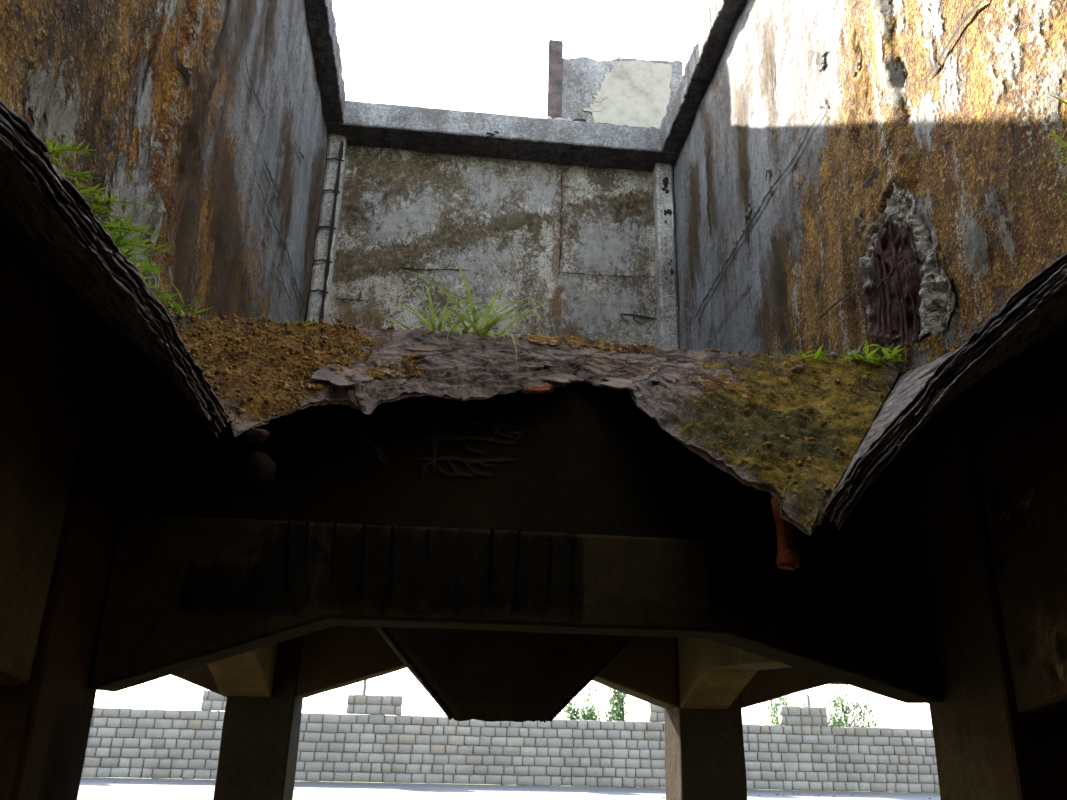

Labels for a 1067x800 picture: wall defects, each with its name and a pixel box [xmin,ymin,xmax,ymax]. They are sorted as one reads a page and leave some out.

leakage [166,0,277,319]
leakage [277,110,294,260]
leakage [300,148,325,322]
leakage [305,0,745,281]
crack [620,313,657,325]
crack [620,349,773,407]
leakage [734,86,753,248]
crack [690,99,825,328]
leakage [759,11,781,174]
leakage [752,219,793,355]
spalling [855,182,956,362]
rust [765,0,1067,374]